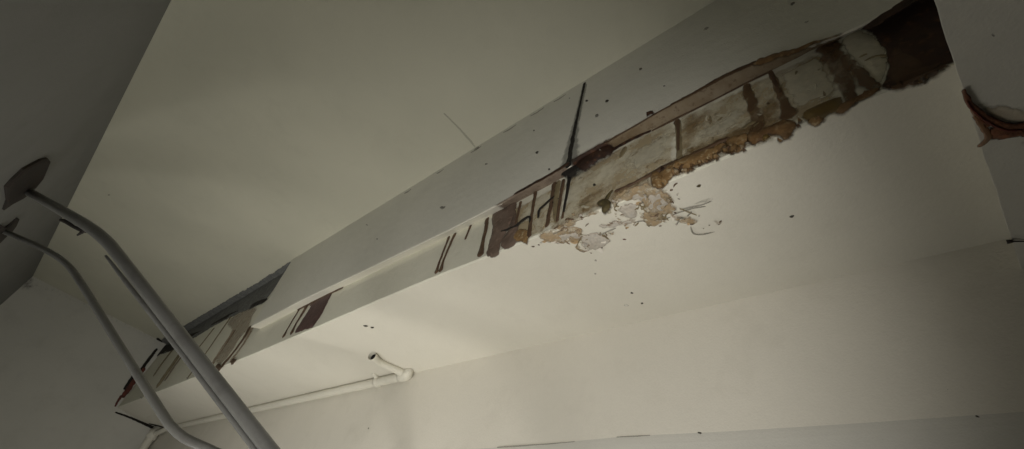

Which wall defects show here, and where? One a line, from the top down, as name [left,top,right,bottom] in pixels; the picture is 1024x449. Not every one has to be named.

crack [501,82,586,232]
rust [434,0,954,274]
peeling [531,183,721,254]
spalling [156,338,174,356]
spalling [183,262,291,338]
rust [282,287,343,338]